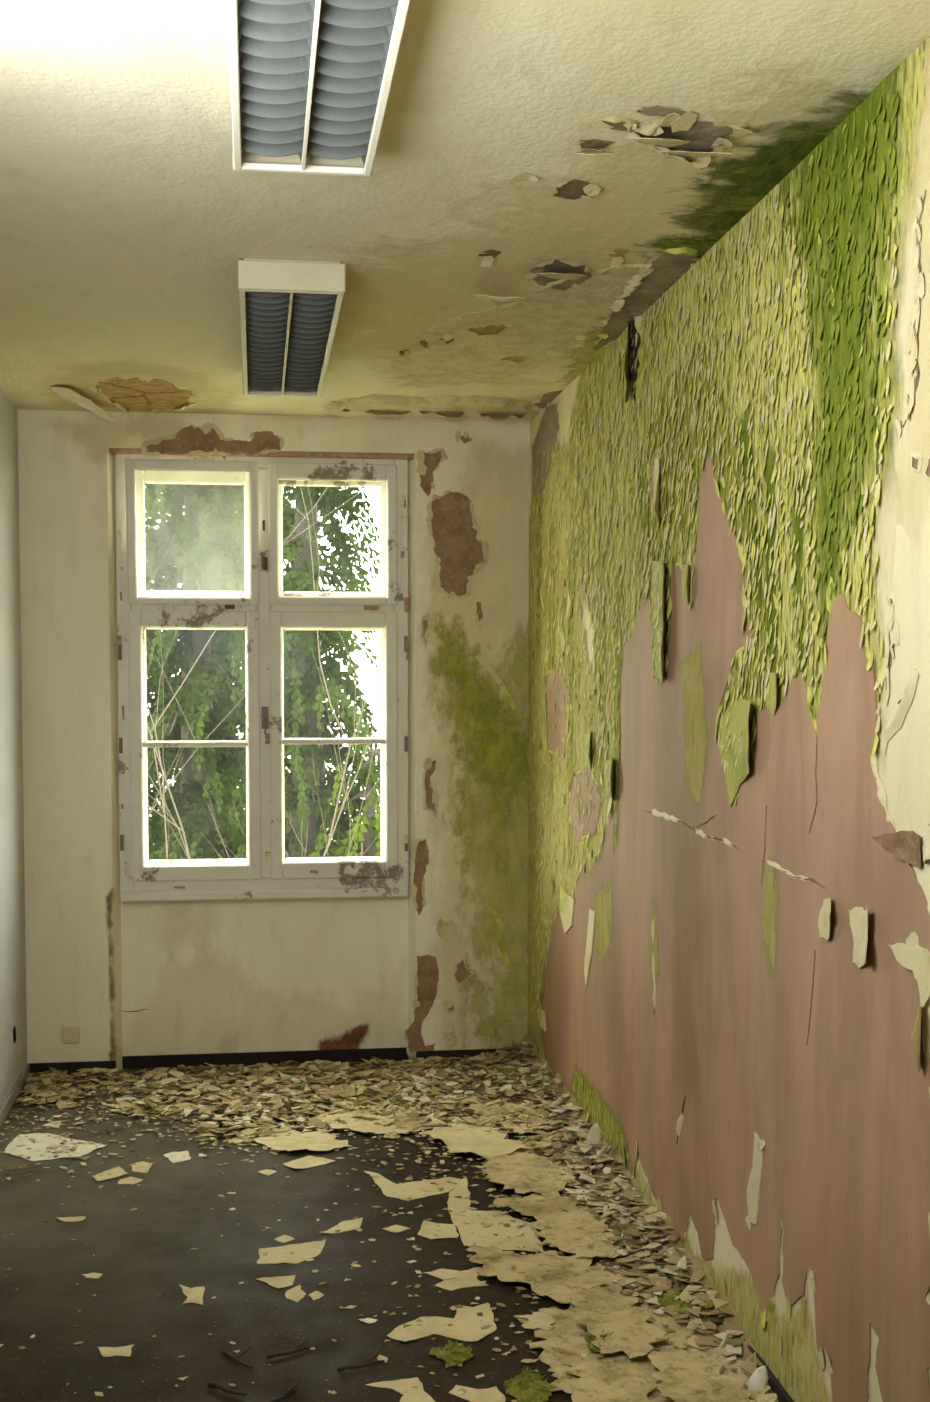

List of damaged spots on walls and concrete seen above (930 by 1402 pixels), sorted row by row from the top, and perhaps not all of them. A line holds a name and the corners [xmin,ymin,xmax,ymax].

flaking render [510,173,601,200]
flaking render [526,259,593,291]
peeling [592,246,703,409]
flaking render [575,105,754,169]
water stain [653,162,766,248]
flaking render [83,374,285,457]
flaking render [321,390,562,632]
water stain [739,409,778,672]
water stain [792,472,805,681]
flaking render [412,838,430,915]
peeling [494,446,930,1402]
flaking render [374,955,479,1127]